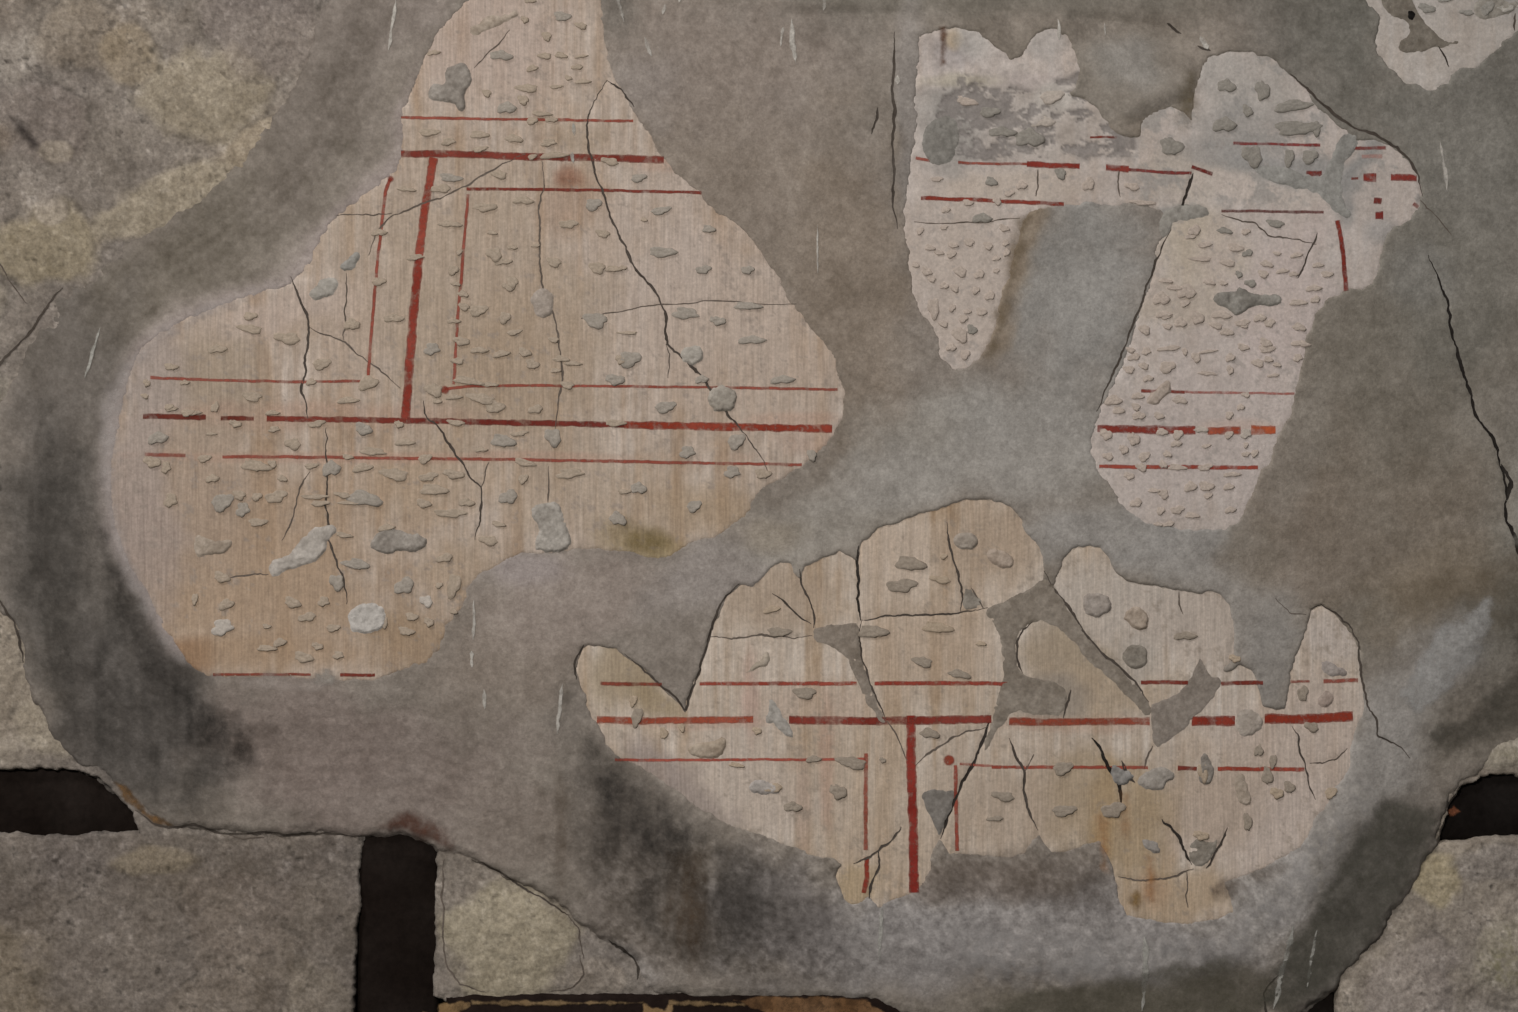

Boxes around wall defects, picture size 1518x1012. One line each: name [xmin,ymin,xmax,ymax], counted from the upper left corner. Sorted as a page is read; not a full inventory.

spalling [1381,0,1458,53]
spalling [428,63,472,112]
crack [281,80,785,604]
spalling [1213,287,1282,315]
crack [1290,74,1518,554]
spalling [370,529,427,554]
spalling [348,603,386,634]
crack [624,569,816,711]
crack [855,524,1038,839]
spalling [1083,593,1149,669]
crack [1276,599,1410,800]
crack [1118,819,1228,907]